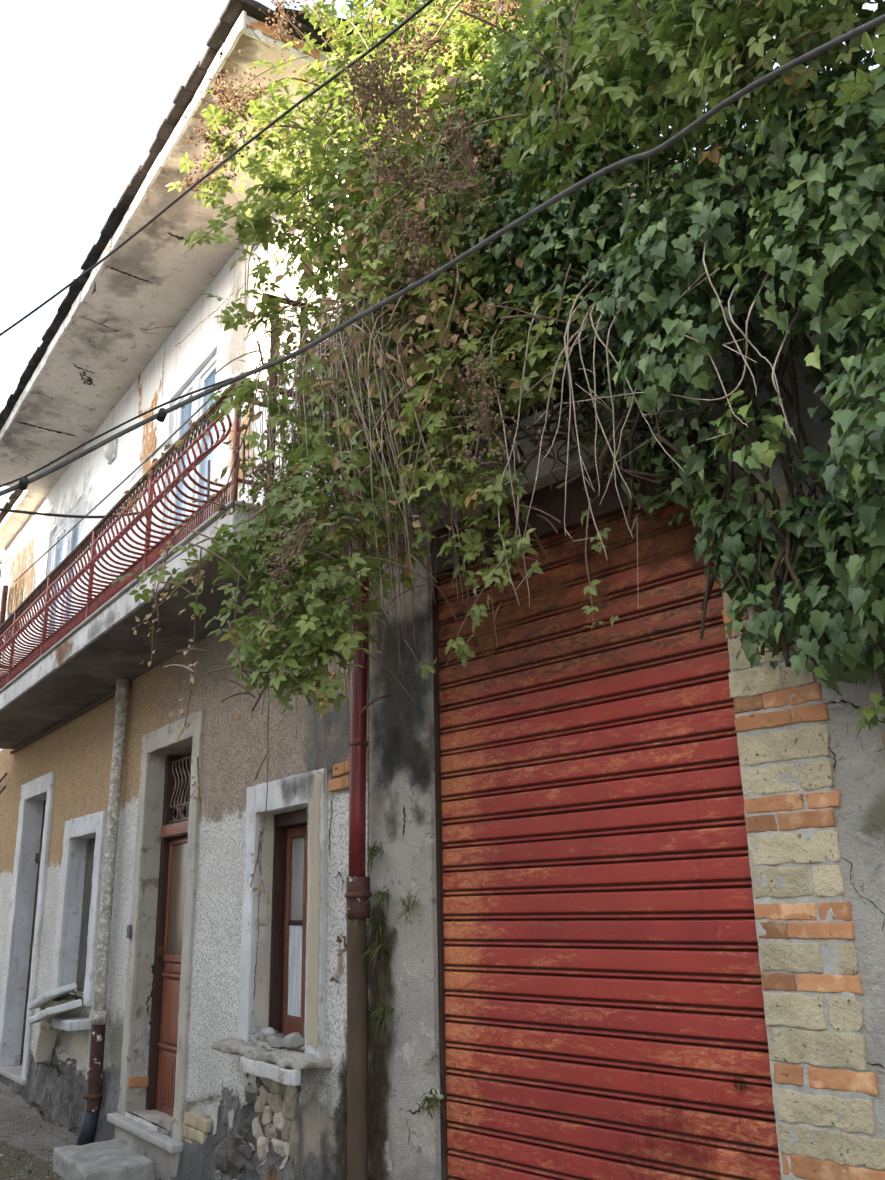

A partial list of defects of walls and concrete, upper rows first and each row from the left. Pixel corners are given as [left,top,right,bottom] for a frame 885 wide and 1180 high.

peeling [138,373,161,481]
peeling [7,539,36,623]
damp [373,607,436,787]
crack [842,857,885,930]
crack [866,1063,885,1073]
flaking render [182,1092,220,1145]